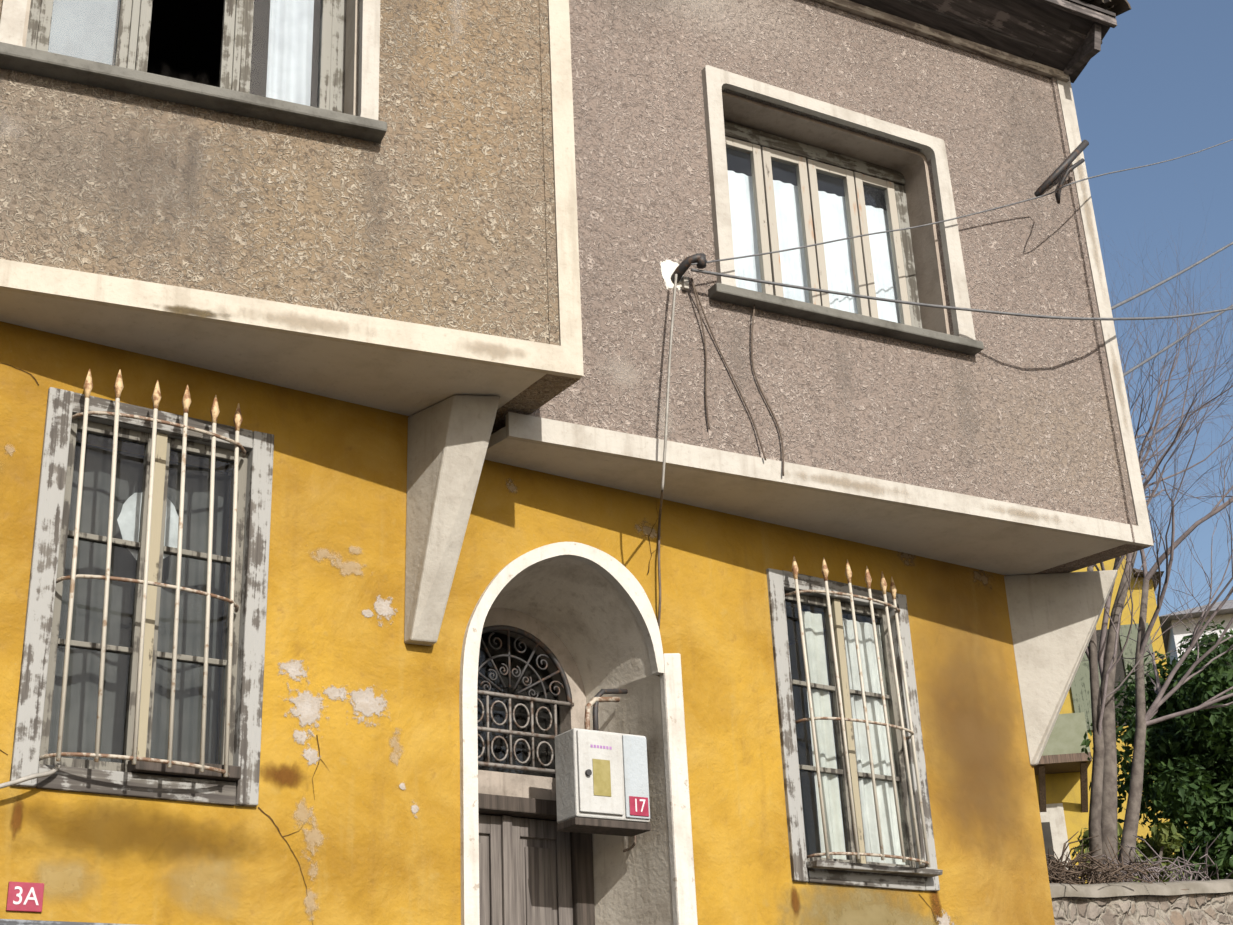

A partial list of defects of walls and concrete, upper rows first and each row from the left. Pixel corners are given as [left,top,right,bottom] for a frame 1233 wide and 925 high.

peeling [312,546,362,575]
peeling [362,595,398,626]
spalling [278,659,389,765]
peeling [390,730,402,764]
peeling [294,803,324,920]